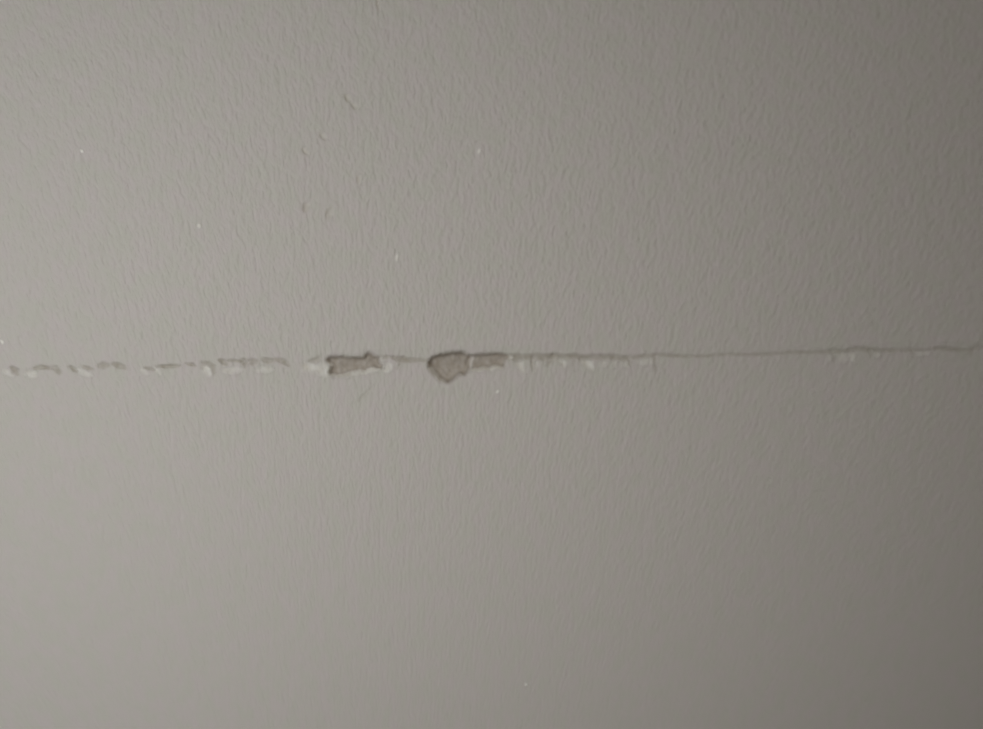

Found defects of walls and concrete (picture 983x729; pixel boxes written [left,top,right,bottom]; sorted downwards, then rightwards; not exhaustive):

crack [9,356,292,377]
spalling [299,351,394,381]
crack [381,354,429,371]
spalling [426,350,540,385]
crack [509,342,983,374]